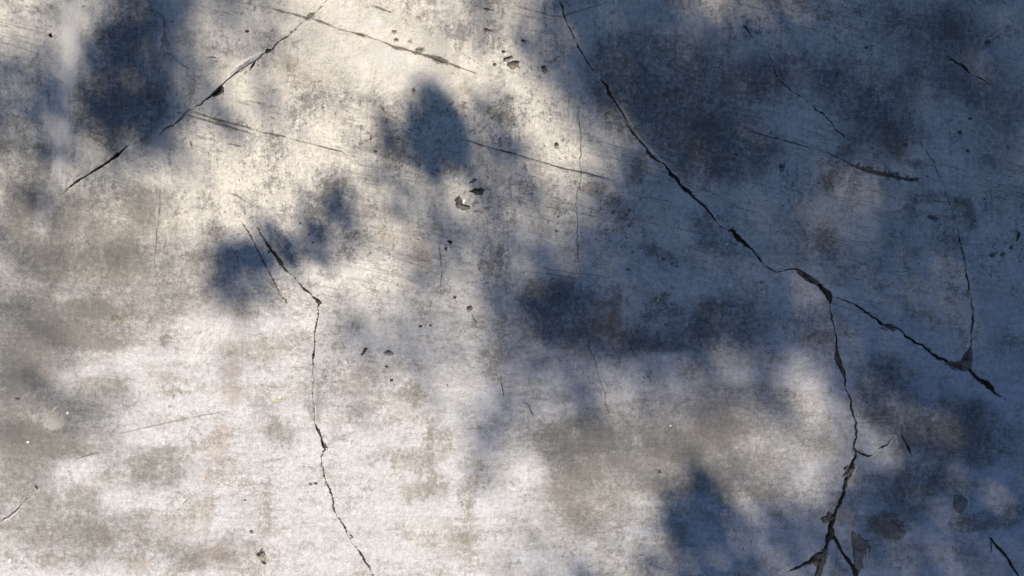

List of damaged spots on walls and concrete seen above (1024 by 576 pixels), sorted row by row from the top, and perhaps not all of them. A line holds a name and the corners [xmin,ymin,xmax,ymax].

crack [62,1,326,194]
crack [242,223,373,574]
crack [514,0,1008,576]